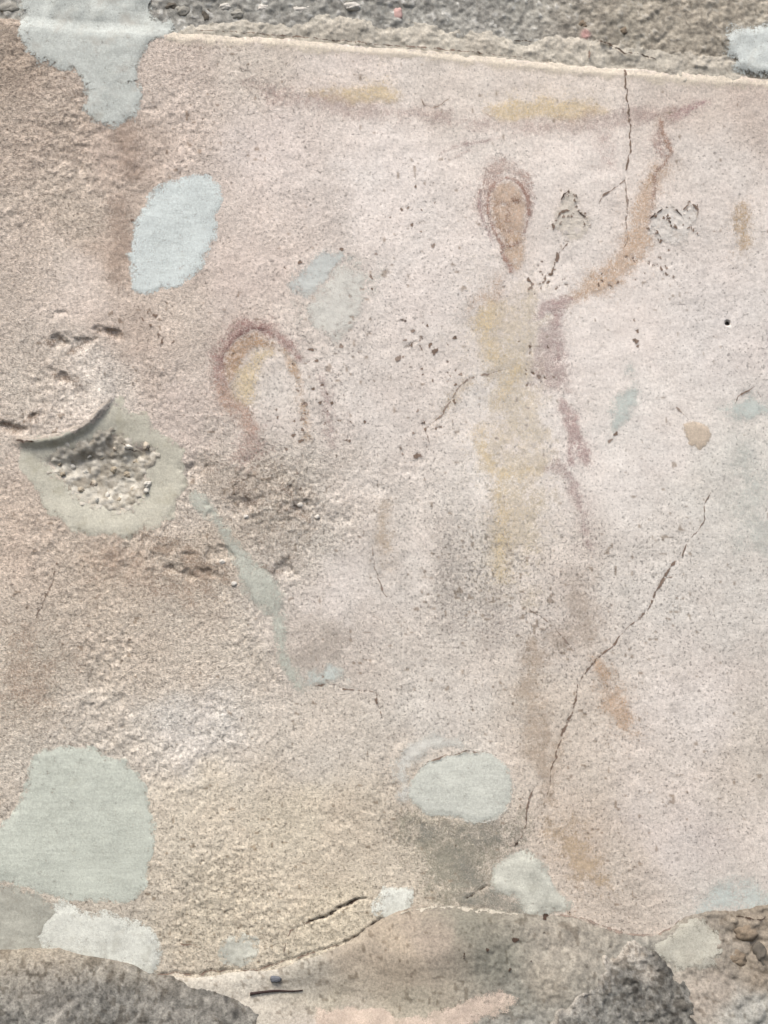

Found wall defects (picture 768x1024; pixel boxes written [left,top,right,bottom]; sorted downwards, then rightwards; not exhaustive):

crack [588,40,655,247]
spalling [39,311,174,394]
spalling [0,401,53,438]
crack [510,493,711,847]
crack [158,898,380,976]